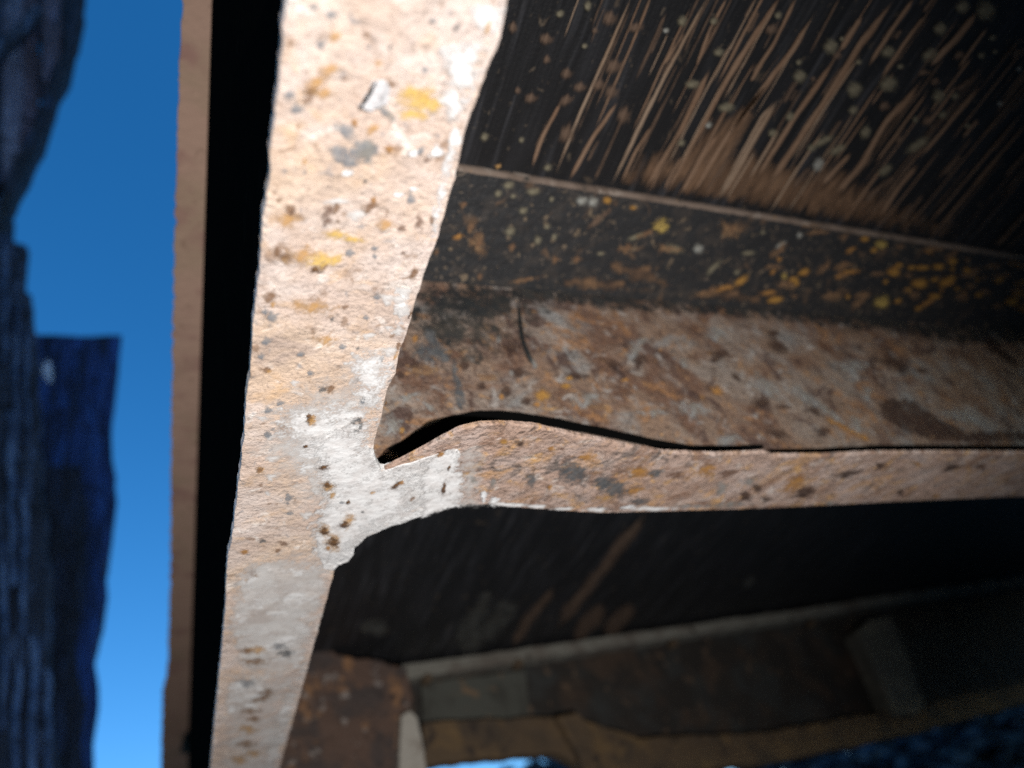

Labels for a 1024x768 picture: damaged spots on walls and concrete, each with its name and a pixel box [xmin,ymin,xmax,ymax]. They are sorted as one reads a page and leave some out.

crack [378,410,1024,464]
rust [879,398,1024,444]